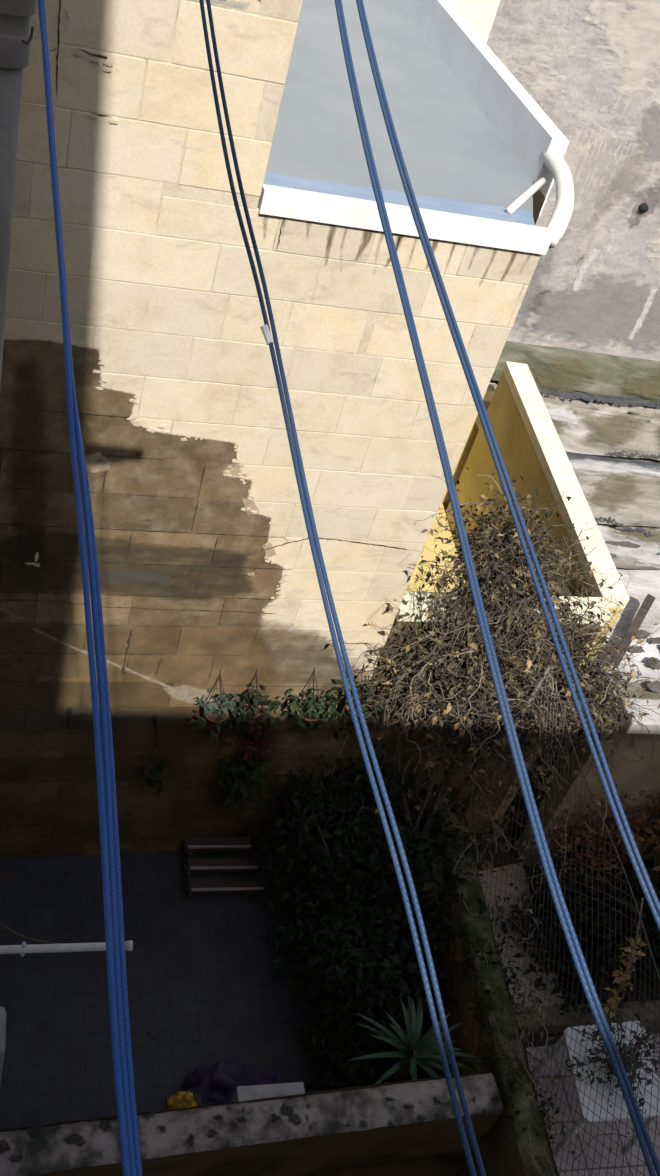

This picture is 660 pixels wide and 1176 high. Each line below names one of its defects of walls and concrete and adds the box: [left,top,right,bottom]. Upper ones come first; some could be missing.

crack [0,599,273,678]
leakage [0,340,366,859]
leakage [568,577,587,597]